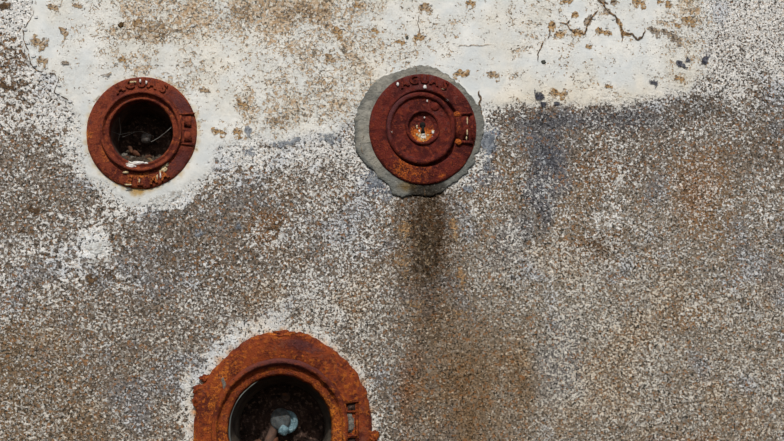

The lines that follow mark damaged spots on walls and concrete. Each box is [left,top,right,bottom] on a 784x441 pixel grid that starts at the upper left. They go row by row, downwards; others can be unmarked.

crack [537,0,646,59]
leakage [395,193,459,314]